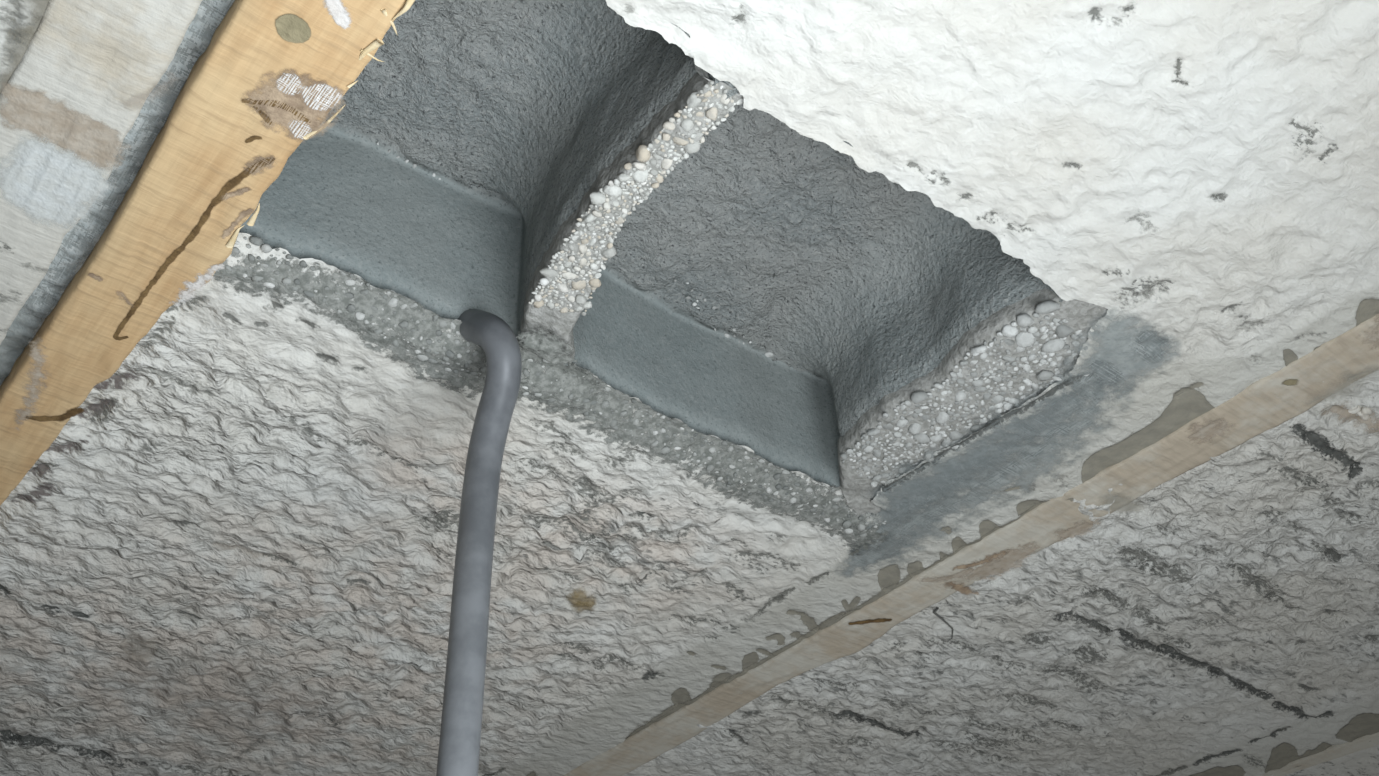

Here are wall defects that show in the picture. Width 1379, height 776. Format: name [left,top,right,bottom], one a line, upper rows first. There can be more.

crack [0,0,49,94]
spalling [528,81,744,316]
crack [12,296,212,503]
spalling [519,420,696,568]
water stain [964,543,1036,580]
water stain [1058,520,1100,541]